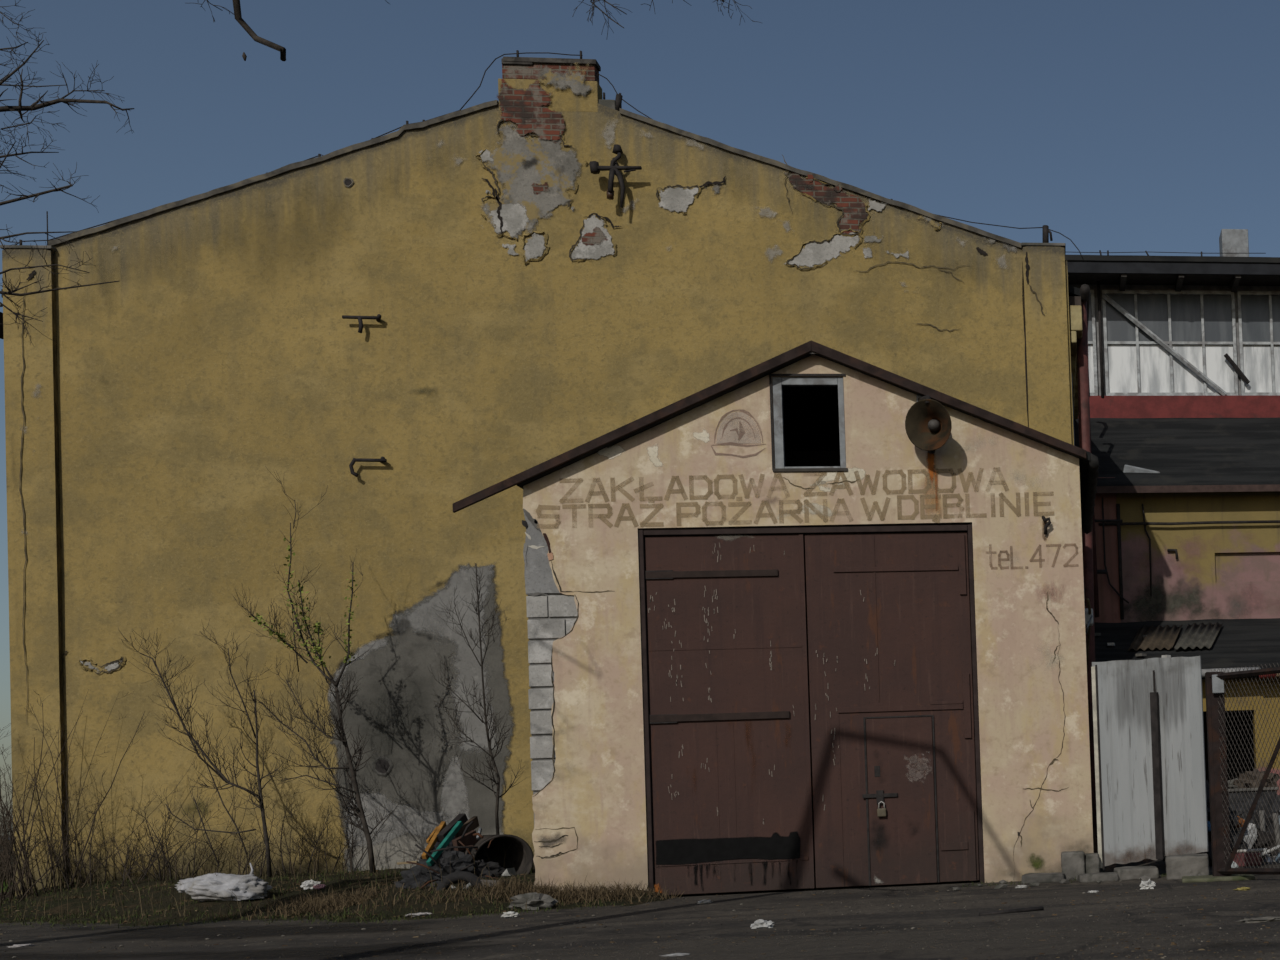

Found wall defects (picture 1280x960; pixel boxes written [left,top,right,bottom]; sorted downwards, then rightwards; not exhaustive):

spalling [456,63,634,265]
spalling [656,176,726,215]
spalling [767,172,909,271]
crack [1022,252,1045,427]
corrosion [927,453,937,509]
spalling [78,655,126,674]
spalling [522,508,609,797]
crack [1013,592,1069,864]
spalling [534,827,578,859]